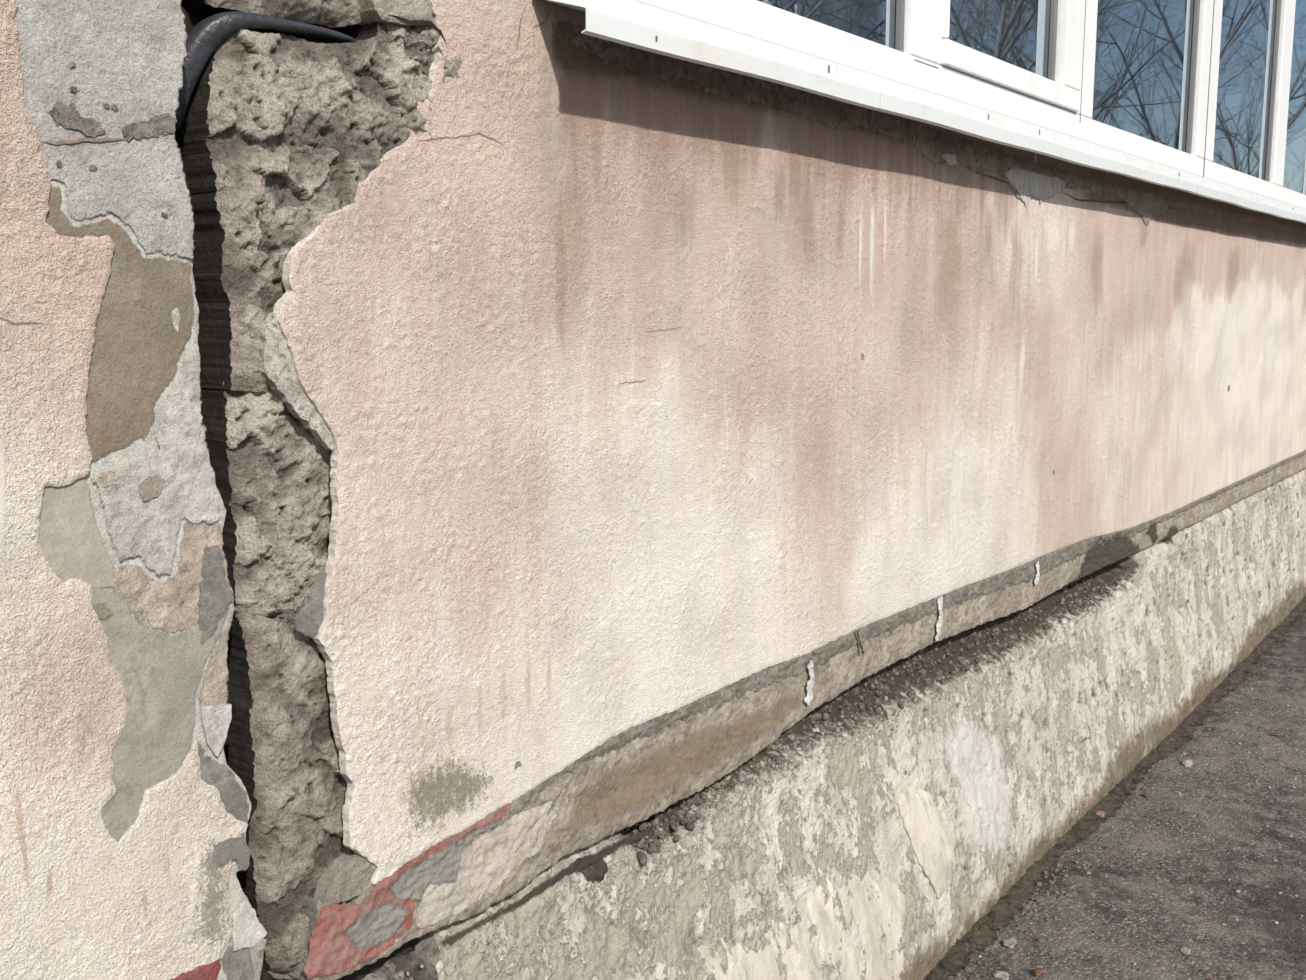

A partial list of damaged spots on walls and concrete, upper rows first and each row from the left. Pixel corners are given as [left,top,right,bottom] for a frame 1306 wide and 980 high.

crack [181,6,208,35]
crack [252,30,337,44]
peeling [557,20,1170,226]
leakage [859,210,886,292]
leakage [1154,206,1306,244]
spalling [16,0,563,980]
leakage [403,759,494,834]
crack [337,828,652,980]
crack [260,962,290,980]